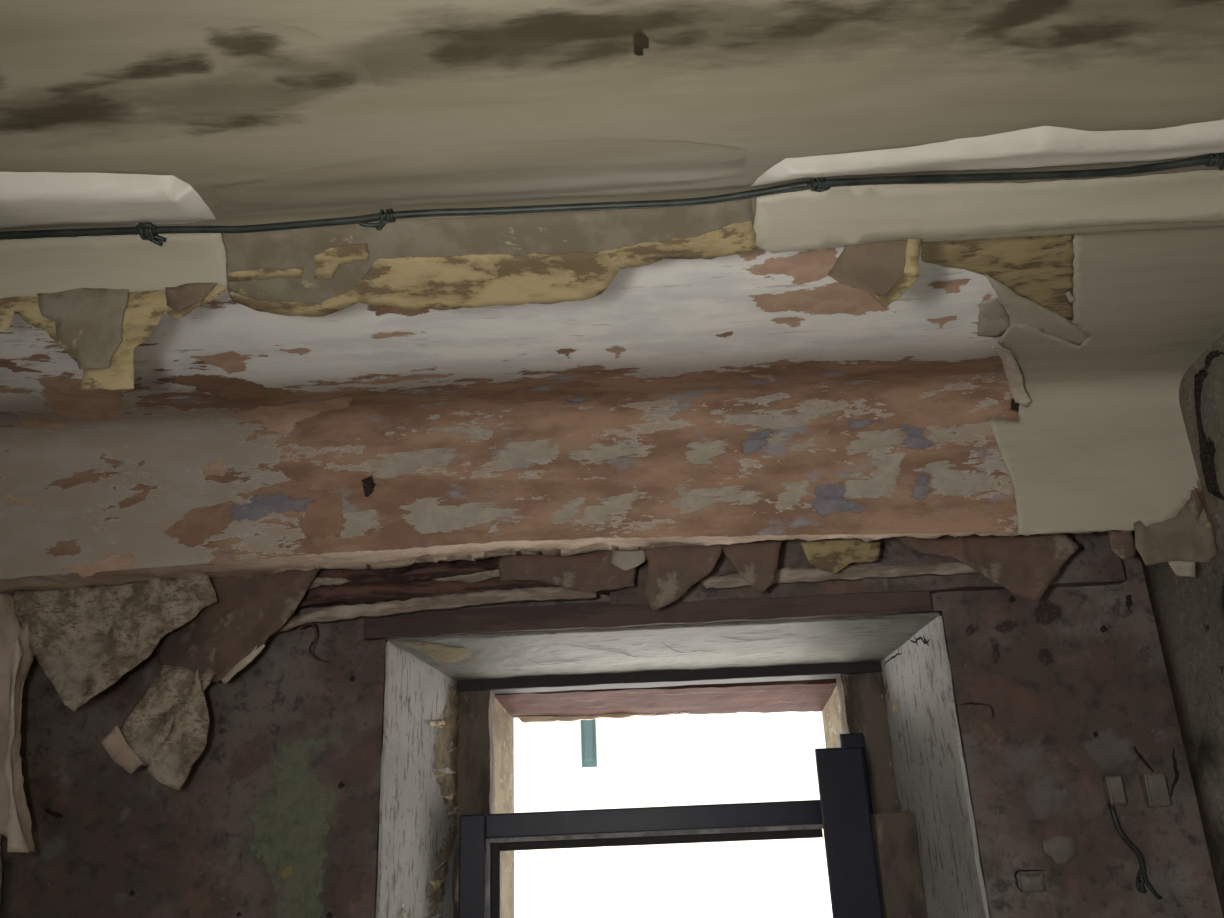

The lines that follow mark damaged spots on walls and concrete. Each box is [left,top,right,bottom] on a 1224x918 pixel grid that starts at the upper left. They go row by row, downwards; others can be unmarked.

water stain [127,59,207,78]
water stain [214,36,275,55]
water stain [431,12,693,62]
water stain [977,0,1067,34]
water stain [0,89,121,130]
peeling [367,305,430,316]
peeling [738,248,889,327]
peeling [0,360,128,429]
peeling [158,351,354,436]
peeling [670,399,1001,517]
crack [1194,350,1224,501]
spalling [0,419,1134,595]